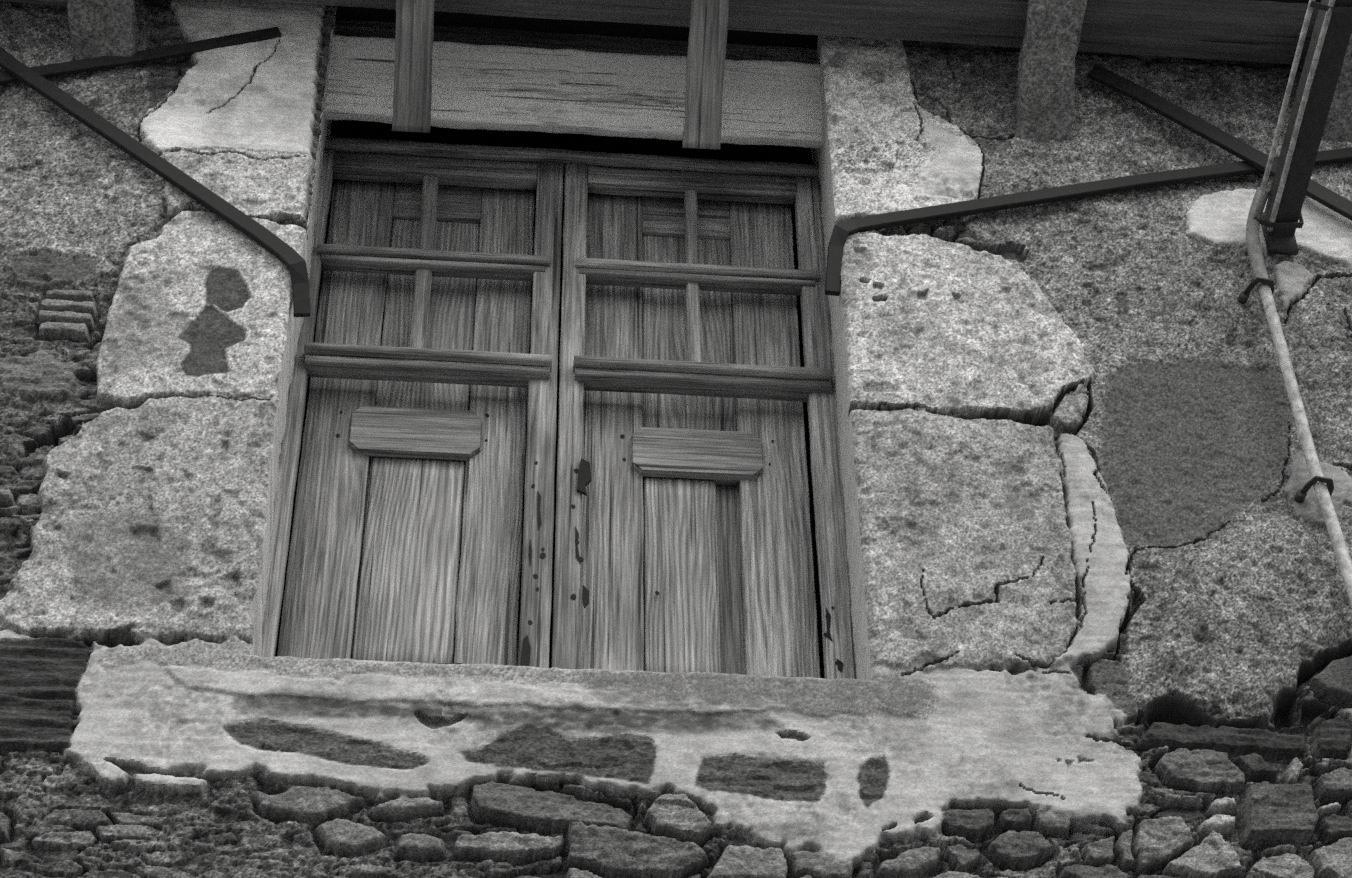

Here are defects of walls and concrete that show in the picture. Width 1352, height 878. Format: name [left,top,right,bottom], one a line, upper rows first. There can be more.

crack [207,38,281,114]
crack [138,59,307,161]
spalling [55,469,72,480]
crack [1261,421,1292,502]
spalling [129,493,163,550]
crack [872,377,1231,676]
spalling [153,568,243,614]
spalling [106,621,137,647]
spalling [414,712,468,729]
spalling [777,729,811,741]
peeling [90,757,224,793]
peeling [915,811,932,824]